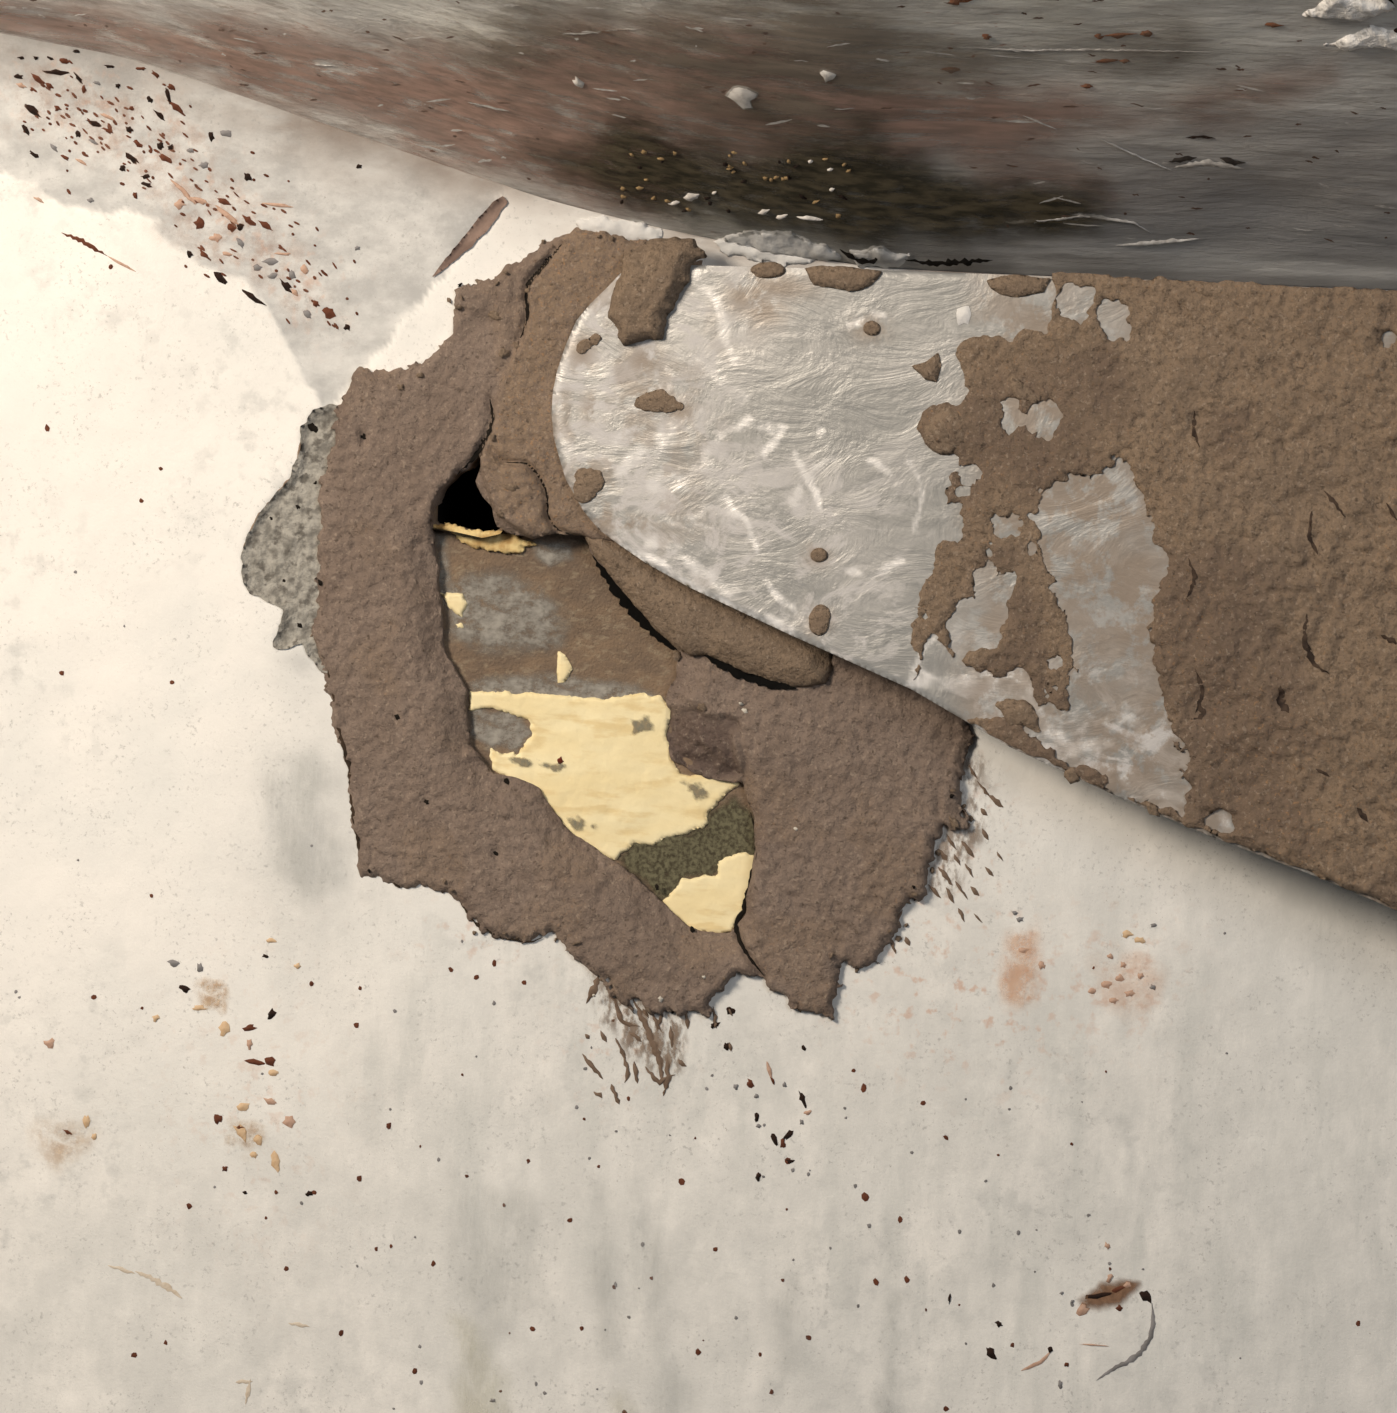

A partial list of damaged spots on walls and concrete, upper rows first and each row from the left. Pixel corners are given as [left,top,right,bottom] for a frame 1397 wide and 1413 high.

spalling [433,196,508,277]
leakage [0,0,1098,246]
flaking render [241,404,339,673]
crack [457,401,585,539]
flaking render [433,506,754,933]